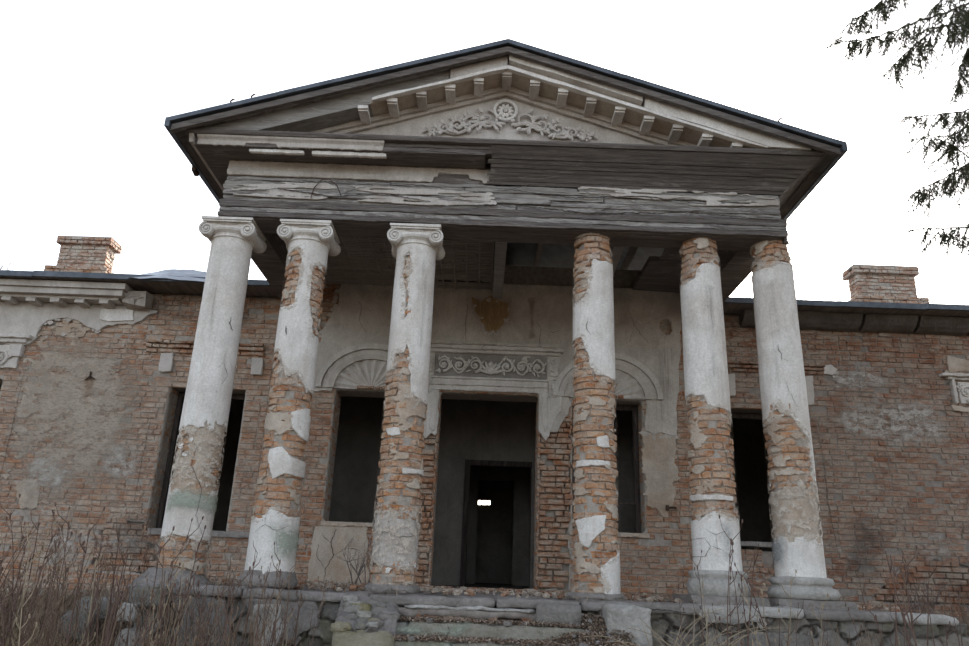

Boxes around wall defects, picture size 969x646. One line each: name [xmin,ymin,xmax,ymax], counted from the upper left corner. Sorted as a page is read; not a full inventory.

peeling [231,179,497,207]
peeling [578,186,780,206]
flaking render [99,309,134,322]
spalling [279,246,339,339]
flaking render [2,474,40,510]
flaking render [170,421,227,498]
spalling [251,348,313,522]
spalling [369,342,439,586]
spalling [535,335,624,594]
spalling [639,395,740,523]
spalling [763,402,823,545]
spalling [88,517,211,577]